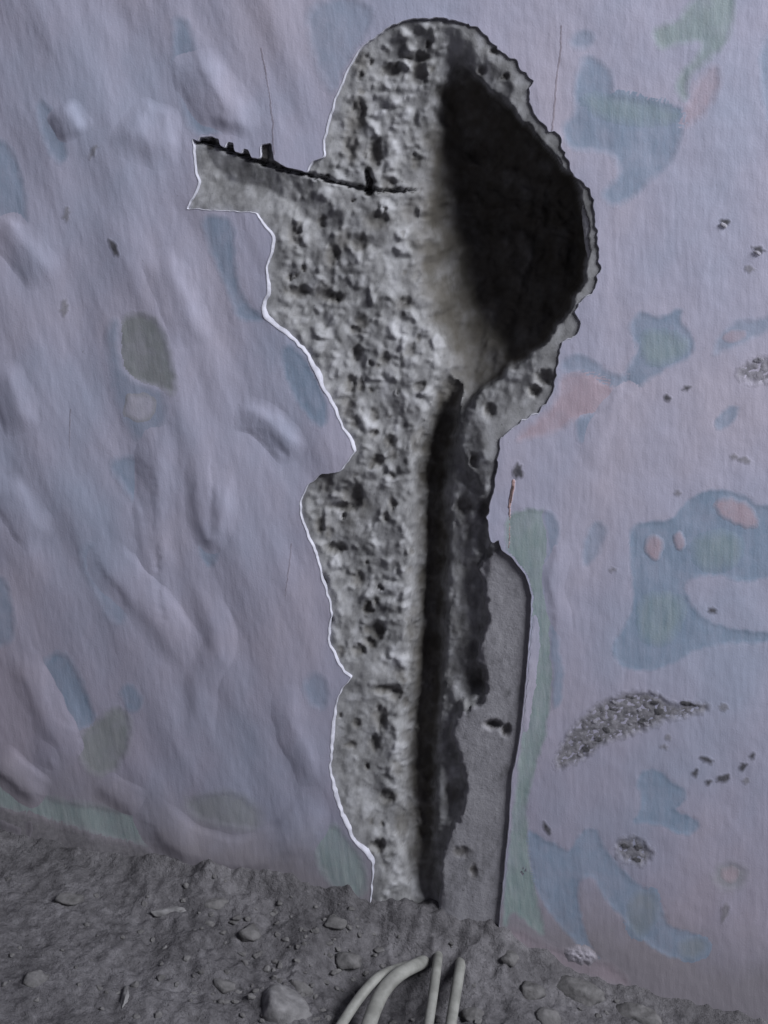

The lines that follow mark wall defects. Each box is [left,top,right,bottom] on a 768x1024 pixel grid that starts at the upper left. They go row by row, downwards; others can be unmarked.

spalling [169,0,757,986]